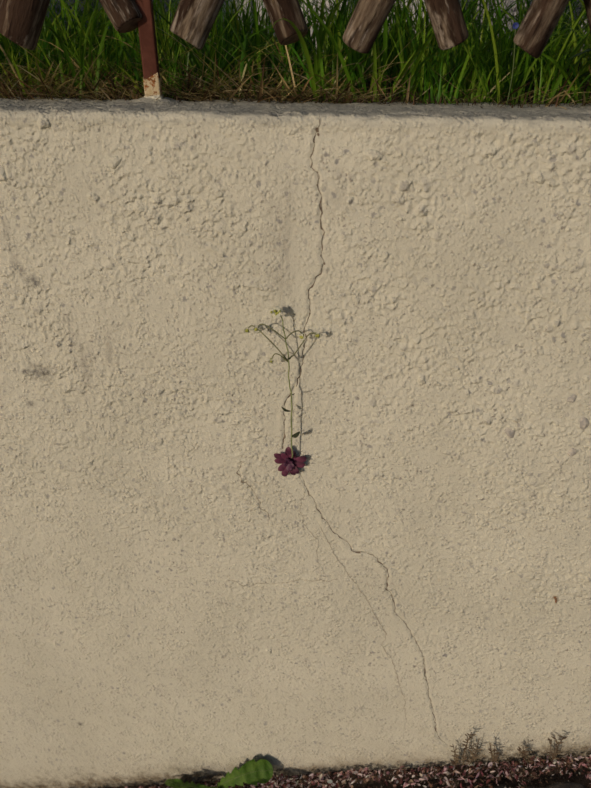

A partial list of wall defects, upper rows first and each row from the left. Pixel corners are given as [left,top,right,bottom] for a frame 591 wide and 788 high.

crack [282,114,325,449]
crack [229,472,442,741]